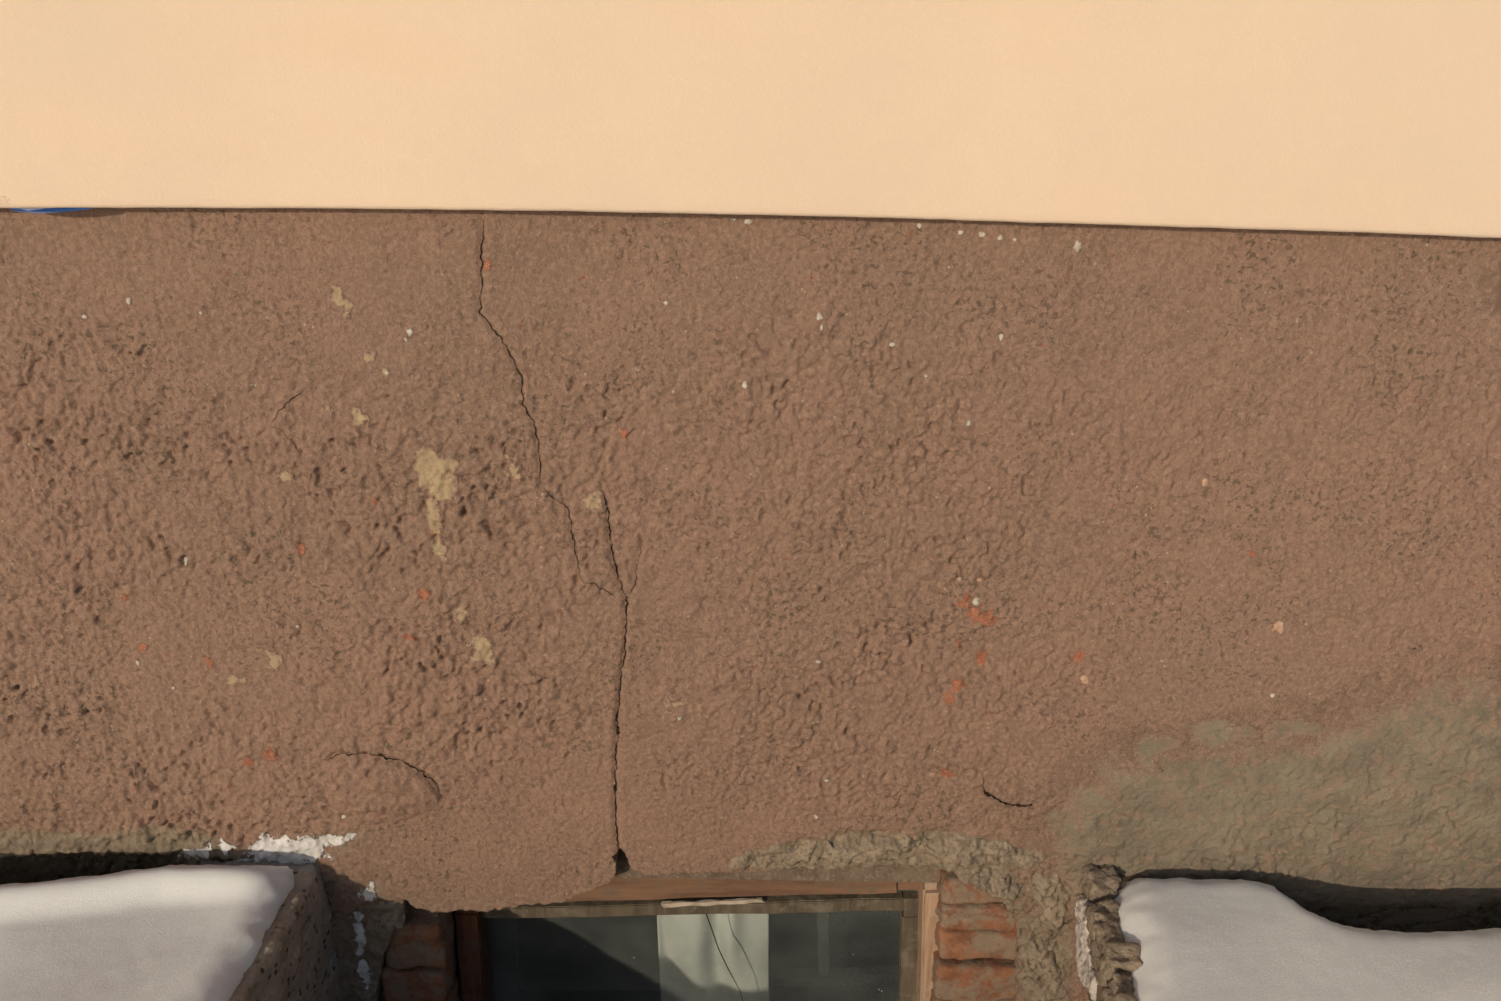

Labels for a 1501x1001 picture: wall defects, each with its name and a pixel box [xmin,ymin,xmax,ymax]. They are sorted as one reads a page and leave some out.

crack [478,219,643,848]
flaking render [953,577,998,627]
flaking render [1271,621,1298,634]
crack [982,772,1032,807]
flaking render [728,636,1501,1001]
leakage [1302,898,1501,933]